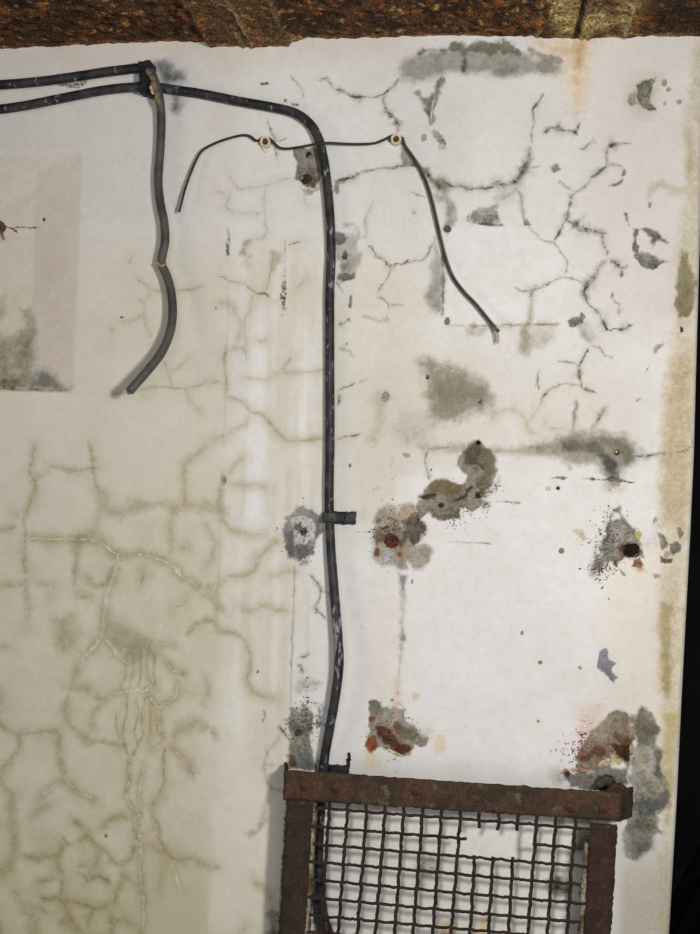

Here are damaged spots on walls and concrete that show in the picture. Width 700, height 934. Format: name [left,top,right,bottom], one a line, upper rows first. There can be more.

crack [324,78,400,126]
crack [339,154,530,190]
crack [518,193,631,399]
water stain [422,360,488,419]
water stain [663,242,698,544]
water stain [536,433,633,477]
spalling [275,498,325,565]
spalling [359,441,504,573]
spalling [579,505,683,589]
spalling [361,699,428,762]
spalling [550,711,635,791]
water stain [625,556,685,859]